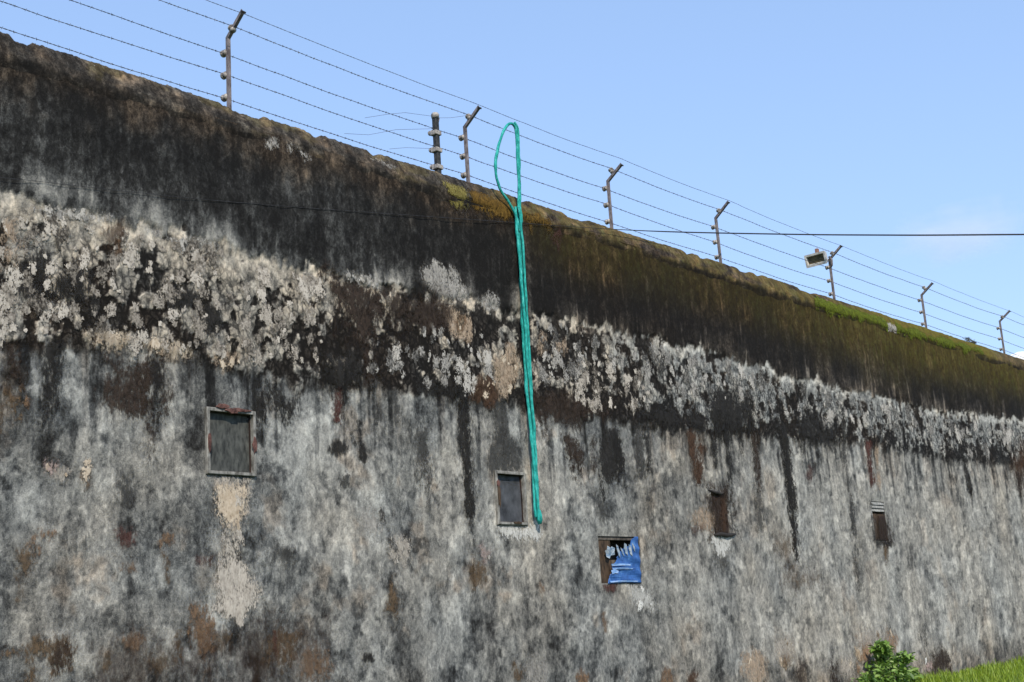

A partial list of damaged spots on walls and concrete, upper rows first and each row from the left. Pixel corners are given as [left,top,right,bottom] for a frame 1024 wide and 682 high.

damp [10,244,101,316]
damp [165,286,224,338]
damp [39,334,67,454]
damp [94,348,175,462]
peeling [212,477,264,628]
damp [254,378,302,437]
damp [317,261,454,513]
damp [416,380,523,544]
damp [533,386,764,544]
rust [686,430,708,486]
damp [776,403,864,590]
damp [962,462,973,505]